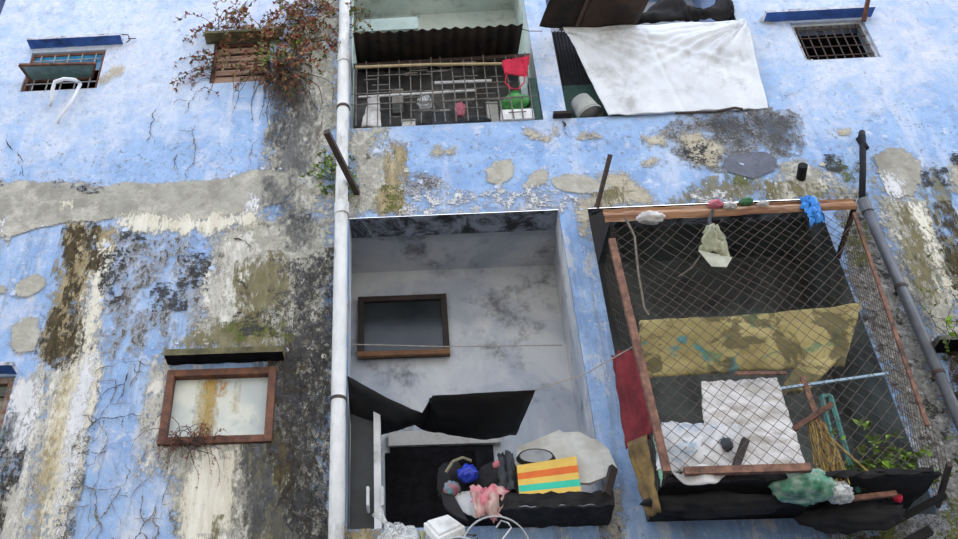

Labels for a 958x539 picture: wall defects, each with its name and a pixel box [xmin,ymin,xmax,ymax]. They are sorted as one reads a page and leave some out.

spalling [52,178,104,194]
peeling [348,125,662,241]
peeling [640,130,670,167]
water stain [659,106,805,173]
peeling [90,0,339,539]
water stain [0,220,120,539]
peeling [764,153,958,539]
crack [65,359,175,539]
peeling [345,525,404,539]
peeling [598,484,629,539]